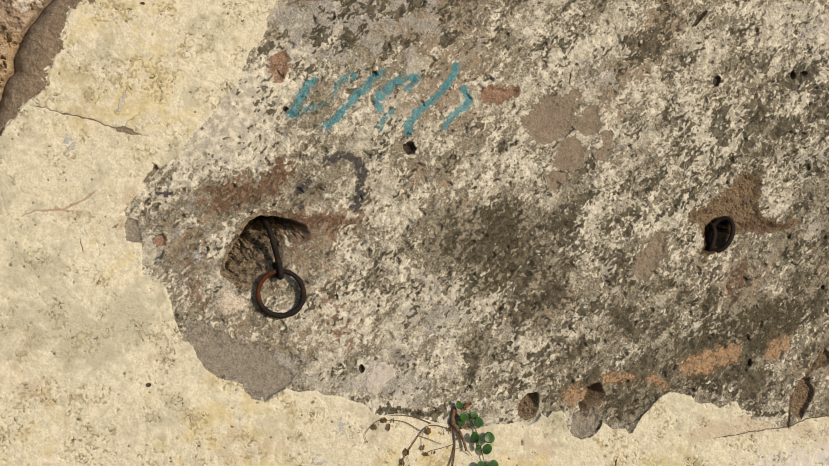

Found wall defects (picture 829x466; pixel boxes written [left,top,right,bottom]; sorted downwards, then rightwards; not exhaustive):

crack [30,105,145,136]
spalling [120,0,829,434]
spalling [570,410,601,440]
crack [713,341,829,439]